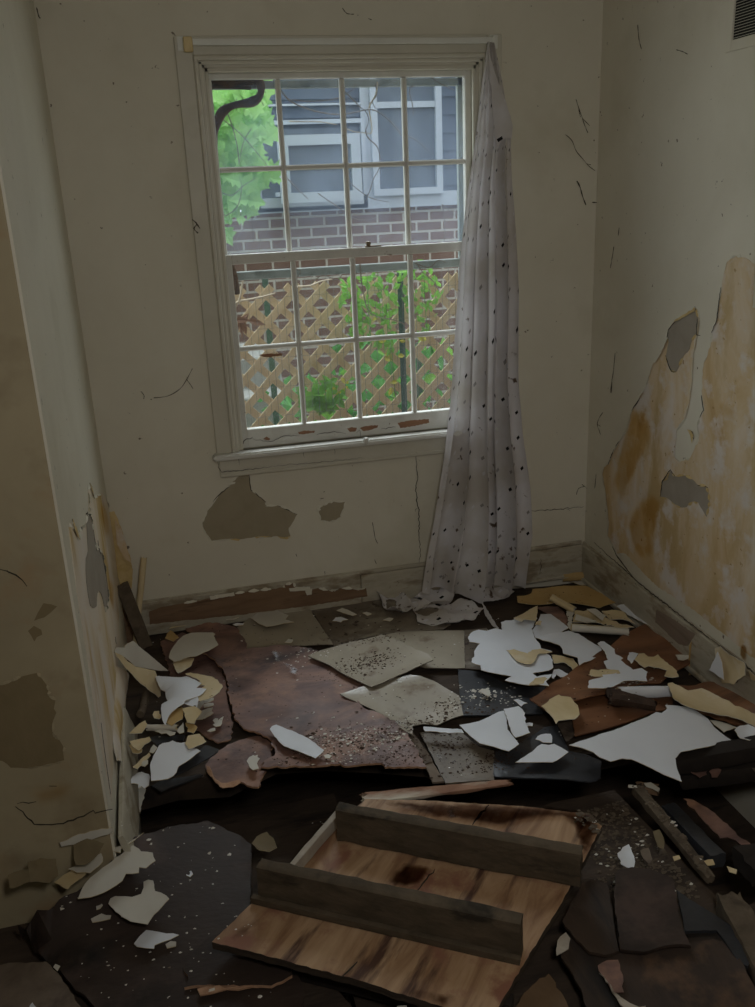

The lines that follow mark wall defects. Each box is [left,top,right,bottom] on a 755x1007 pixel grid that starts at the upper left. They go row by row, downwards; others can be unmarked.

peeling [68,475,371,801]
peeling [602,254,755,658]